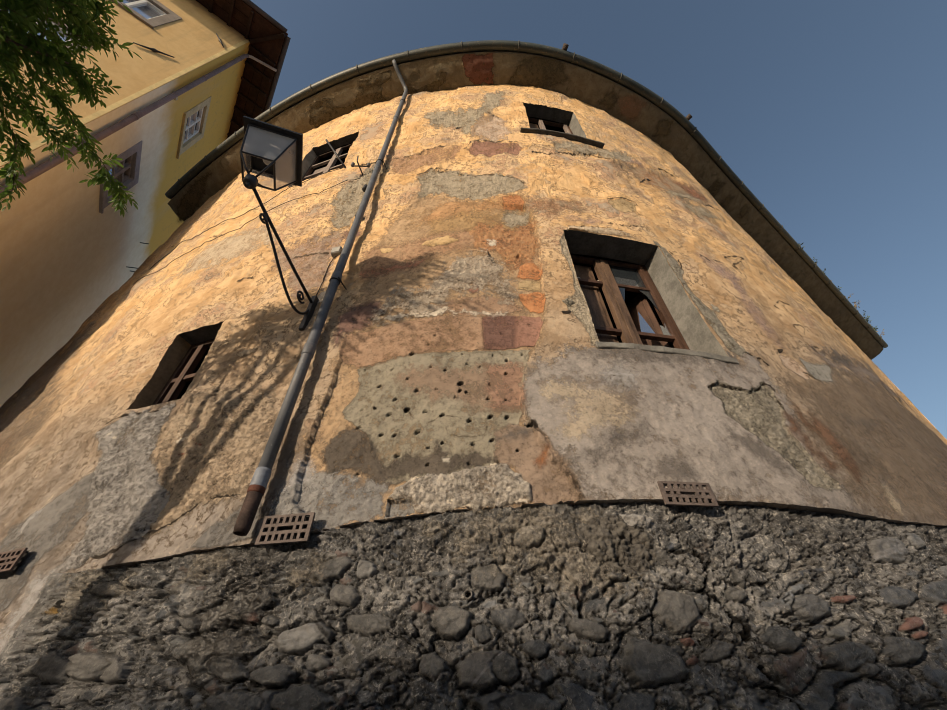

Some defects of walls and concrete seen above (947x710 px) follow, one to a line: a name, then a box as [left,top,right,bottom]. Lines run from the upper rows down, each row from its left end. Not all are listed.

spalling [183,53,582,519]
spalling [560,225,630,345]
spalling [777,349,809,380]
peeling [48,385,278,576]
crack [522,389,585,500]
spalling [708,380,842,491]